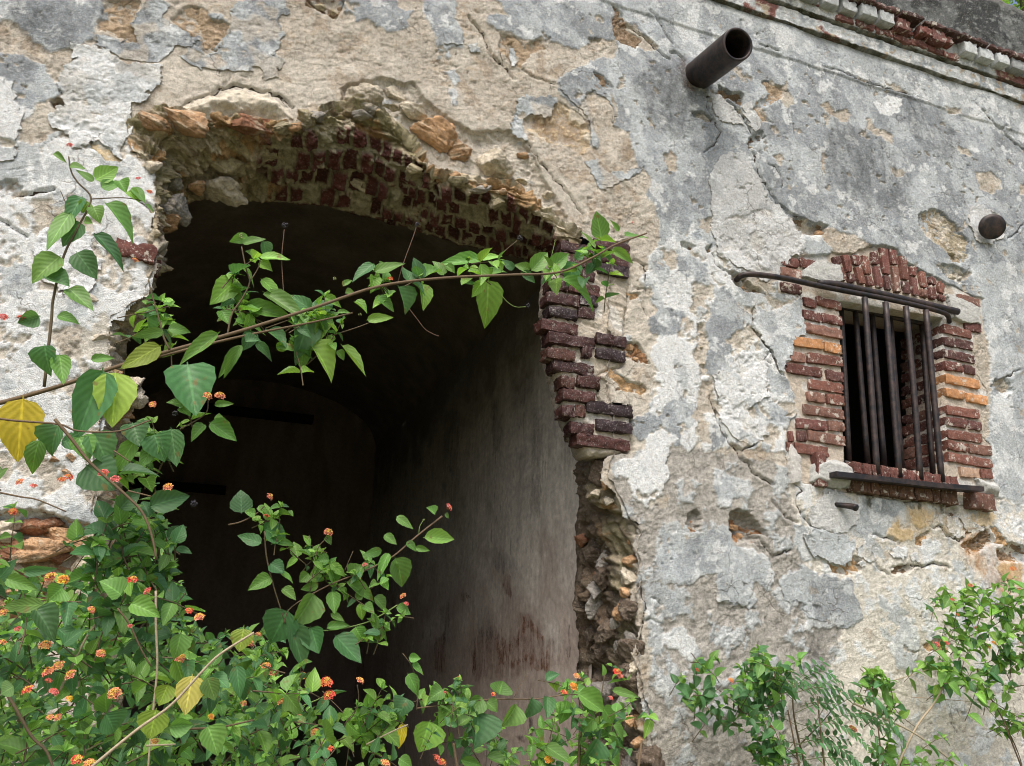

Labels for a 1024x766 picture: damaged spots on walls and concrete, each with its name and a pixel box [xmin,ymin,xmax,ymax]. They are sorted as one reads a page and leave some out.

flaking render [0,78,25,162]
crack [706,96,798,218]
spalling [47,0,645,455]
flaking render [919,205,1006,284]
spalling [49,453,76,474]
crack [708,397,824,530]
flaking render [0,481,123,606]
spalling [572,261,665,766]
flaking render [728,512,761,543]
flaking render [946,513,1024,562]
flaking render [0,589,27,619]
spalling [80,634,125,727]